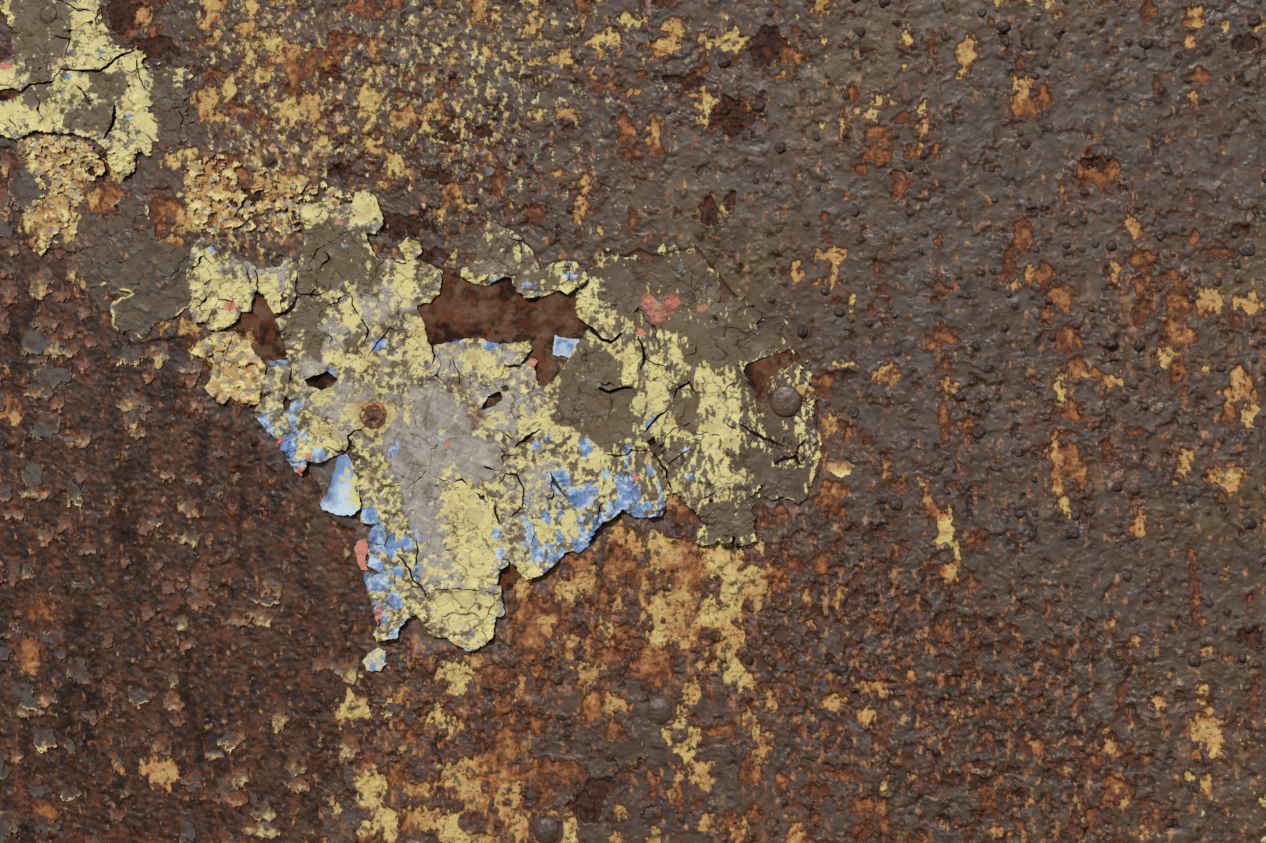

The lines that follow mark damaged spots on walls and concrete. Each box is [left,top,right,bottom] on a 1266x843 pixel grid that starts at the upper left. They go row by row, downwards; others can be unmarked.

crack [9,0,148,139]
rust [223,0,405,134]
peeling [819,92,898,147]
rust [977,9,1055,126]
crack [274,252,369,344]
peeling [0,0,857,843]
crack [456,429,541,524]
crack [591,304,697,488]
peeling [828,357,902,384]
peeling [881,454,892,482]
rust [997,220,1113,539]
rust [472,576,646,744]